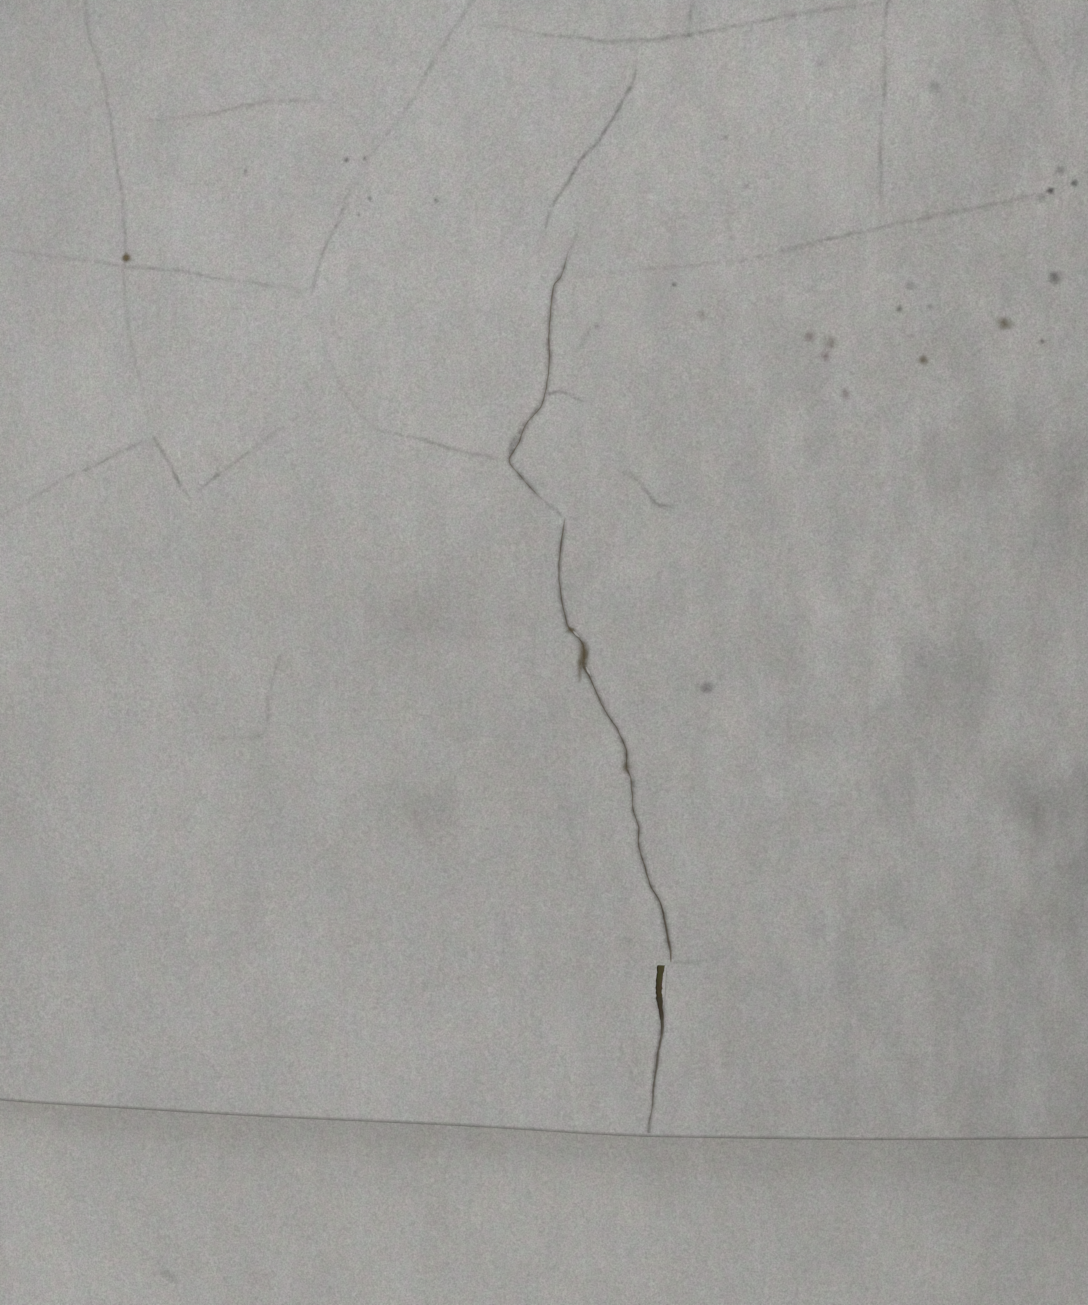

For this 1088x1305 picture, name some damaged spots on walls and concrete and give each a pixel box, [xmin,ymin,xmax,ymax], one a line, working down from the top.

crack [509,254,672,1125]